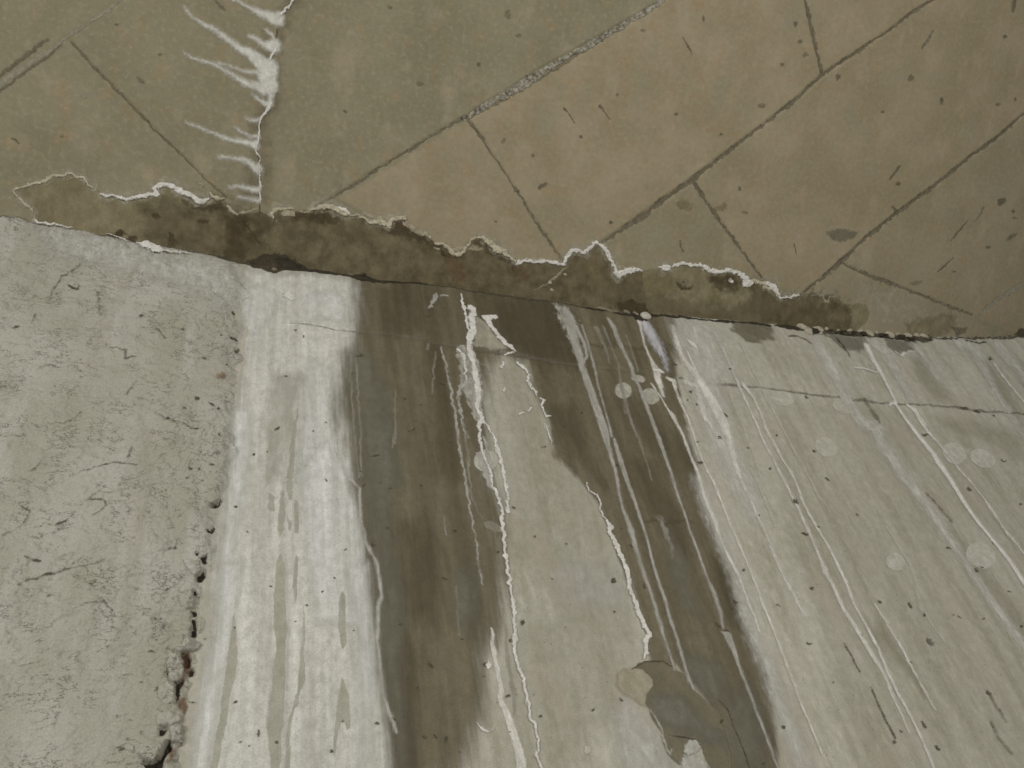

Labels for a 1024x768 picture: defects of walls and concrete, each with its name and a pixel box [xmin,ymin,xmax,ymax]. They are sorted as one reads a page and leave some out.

spalling [797,323,933,342]
water stain [13,172,1024,768]
spalling [119,553,207,768]